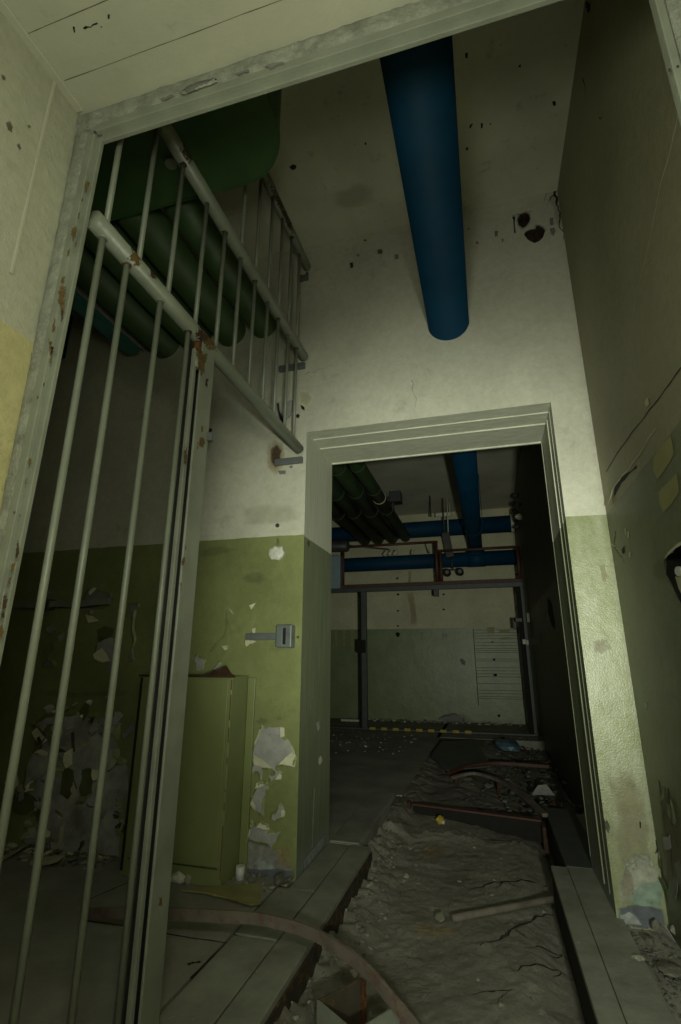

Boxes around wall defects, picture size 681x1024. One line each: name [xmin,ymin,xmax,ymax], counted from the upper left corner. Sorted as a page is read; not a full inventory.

crack [544,191,564,240]
rust [48,277,67,363]
rust [195,326,217,386]
rust [271,446,281,464]
peeling [4,700,134,858]
peeling [246,725,297,851]
crack [473,879,547,889]
crack [472,913,572,1001]